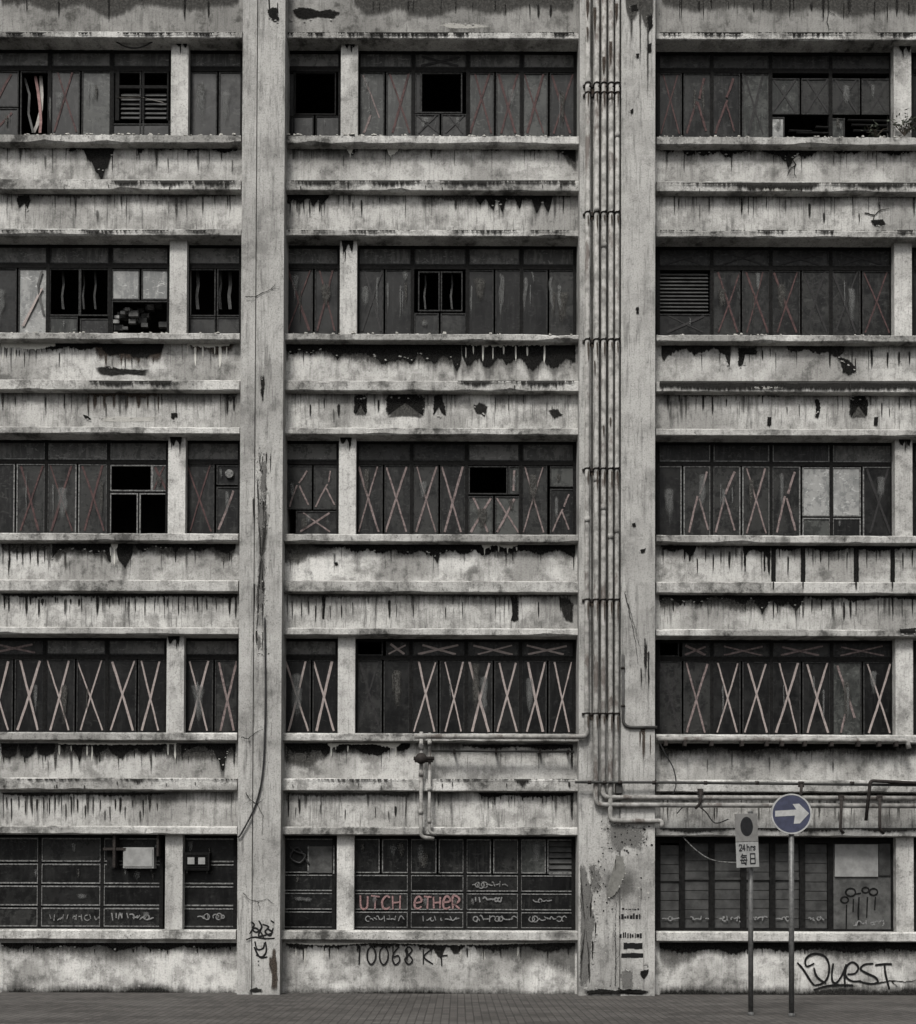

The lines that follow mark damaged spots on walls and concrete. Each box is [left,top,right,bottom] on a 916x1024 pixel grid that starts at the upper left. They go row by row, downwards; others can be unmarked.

damp [355,0,573,18]
damp [1,343,237,421]
damp [286,350,425,363]
spalling [354,394,446,418]
damp [371,345,576,411]
spalling [473,398,496,417]
damp [591,0,916,732]
damp [1,742,237,821]
peeling [579,821,653,995]
damp [659,942,916,967]